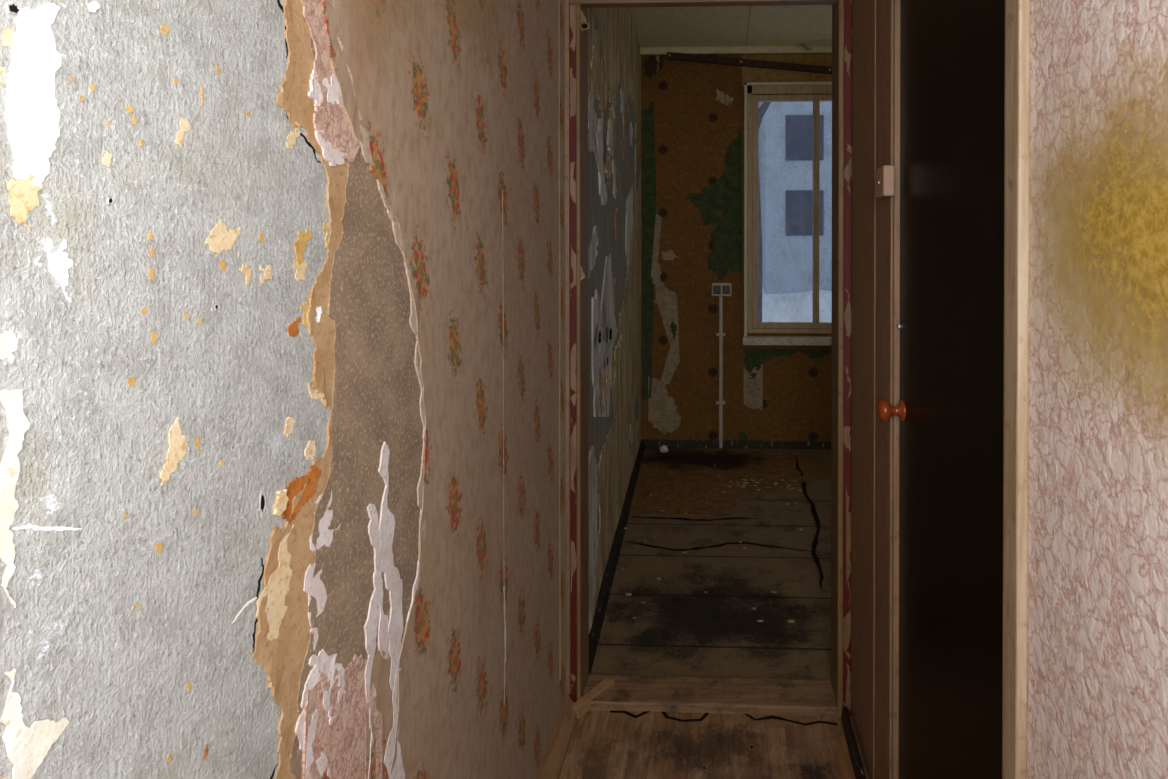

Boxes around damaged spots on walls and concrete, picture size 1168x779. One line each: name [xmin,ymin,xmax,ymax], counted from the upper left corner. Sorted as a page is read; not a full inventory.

peeling [6,173,43,234]
peeling [570,5,681,633]
peeling [687,129,742,280]
water stain [1043,123,1168,382]
spalling [258,489,266,518]